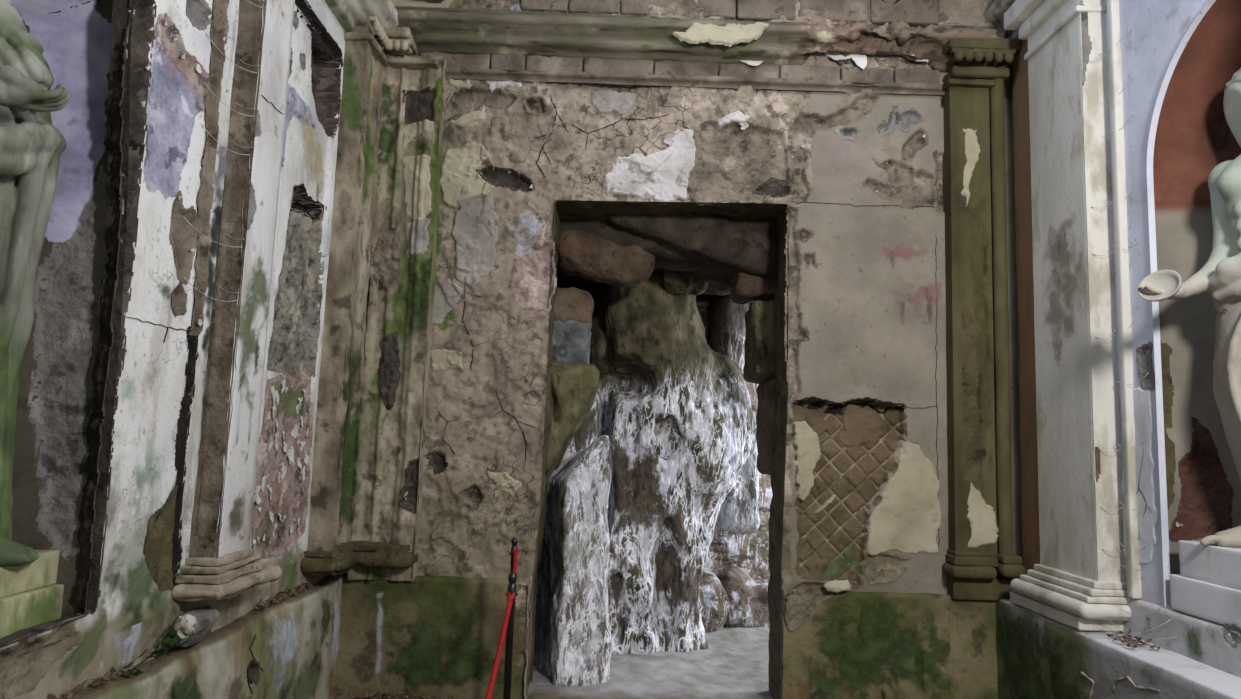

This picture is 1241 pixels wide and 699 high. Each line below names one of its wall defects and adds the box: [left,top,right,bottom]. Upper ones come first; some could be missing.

flaking render [281,0,343,167]
flaking render [476,165,535,192]
crack [536,95,667,177]
flaking render [0,0,263,699]
flaking render [252,183,327,558]
flaking render [687,92,951,631]
flaking render [1136,341,1233,541]